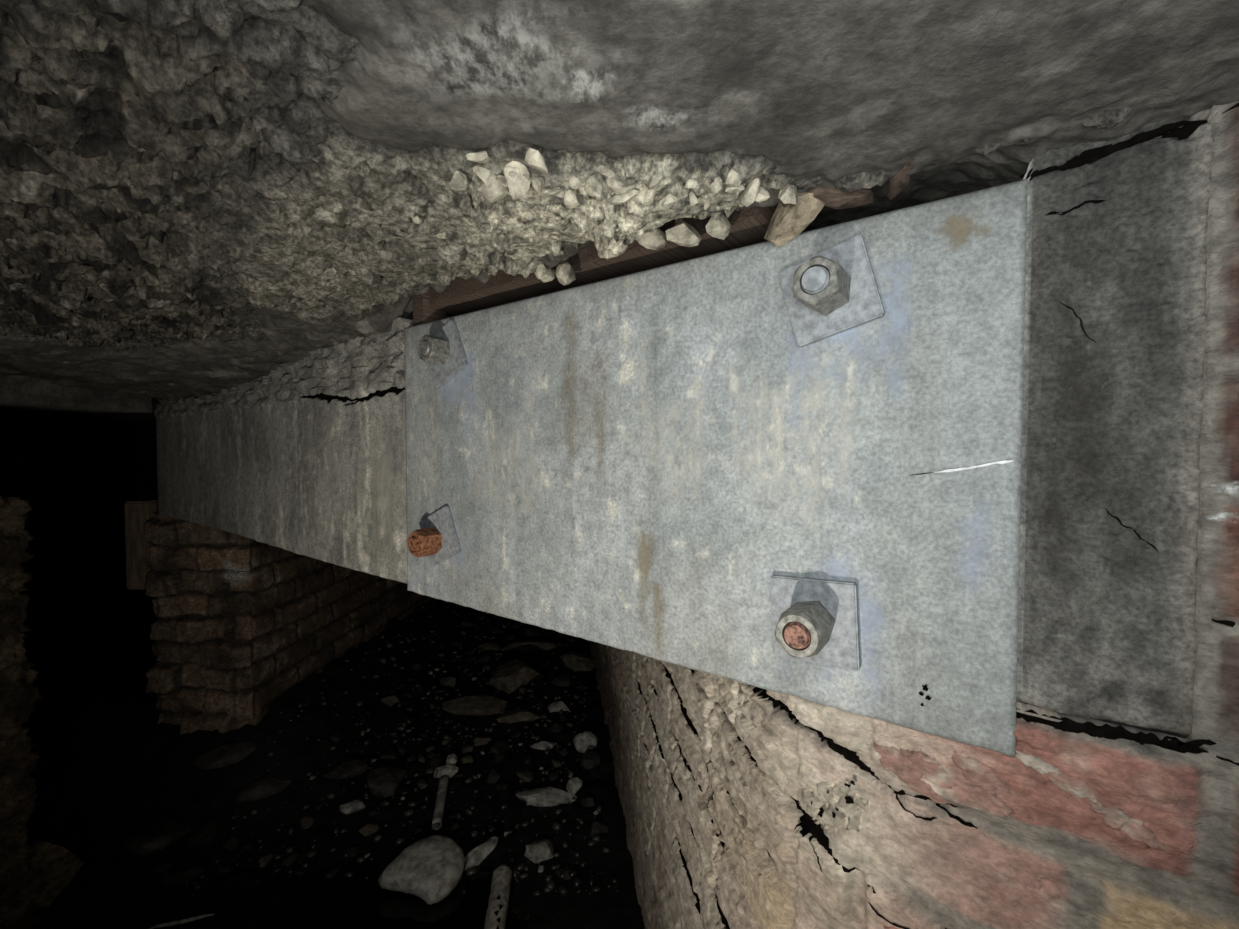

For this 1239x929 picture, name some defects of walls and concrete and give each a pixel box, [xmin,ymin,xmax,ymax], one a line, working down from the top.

spalling [0,0,891,352]
crack [303,386,405,406]
crack [636,664,744,929]
crack [722,709,909,929]
crack [748,685,978,829]
crack [1016,708,1239,766]